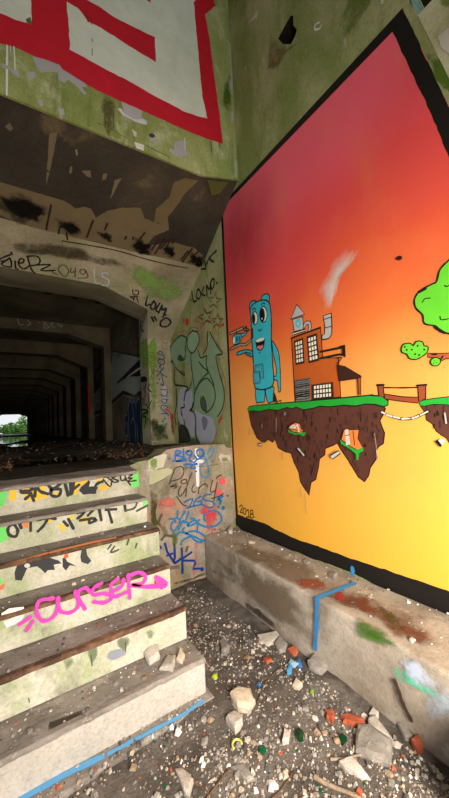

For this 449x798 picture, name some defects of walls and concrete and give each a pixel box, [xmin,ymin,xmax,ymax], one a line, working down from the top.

peeling [117,102,158,151]
peeling [169,140,189,162]
leakage [18,244,117,265]